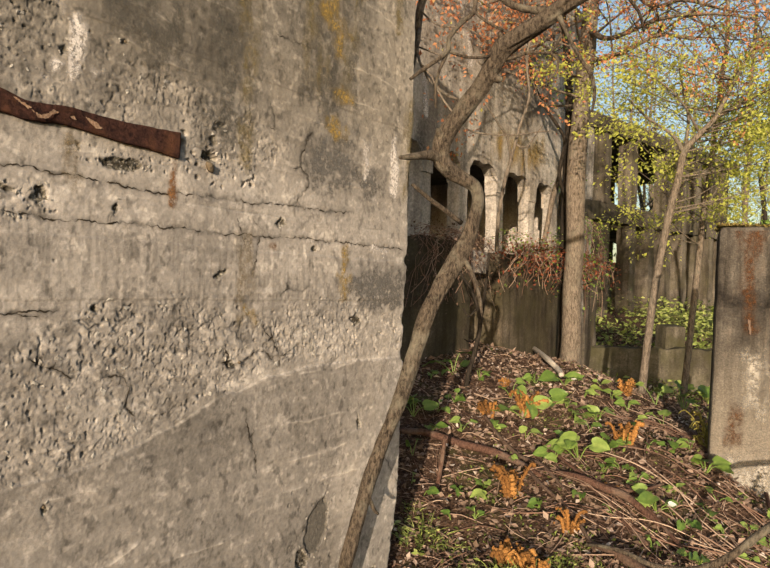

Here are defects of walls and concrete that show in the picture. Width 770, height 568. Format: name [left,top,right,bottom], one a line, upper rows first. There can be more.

damp [51,14,87,81]
damp [299,0,363,130]
spalling [99,152,151,174]
rust [168,171,176,207]
crack [0,133,401,268]
damp [310,137,408,201]
crack [2,309,57,317]